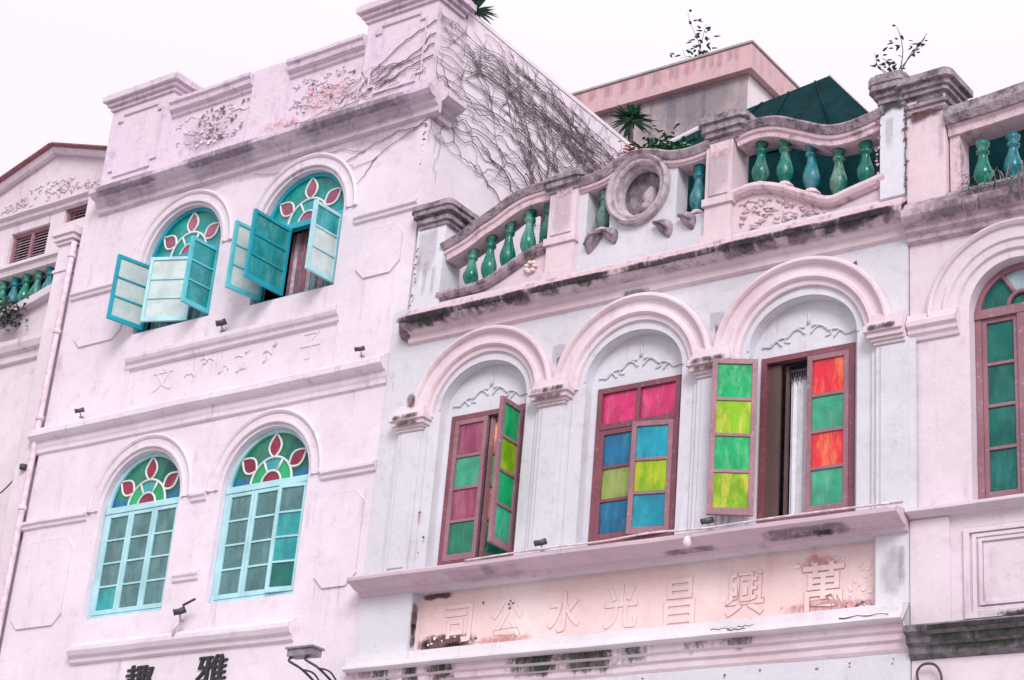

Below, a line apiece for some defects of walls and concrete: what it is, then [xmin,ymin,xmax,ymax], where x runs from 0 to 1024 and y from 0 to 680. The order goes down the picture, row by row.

water stain [622,205,893,272]
water stain [397,271,608,327]
water stain [867,321,894,331]
peeling [841,562,875,609]
water stain [927,608,1024,649]